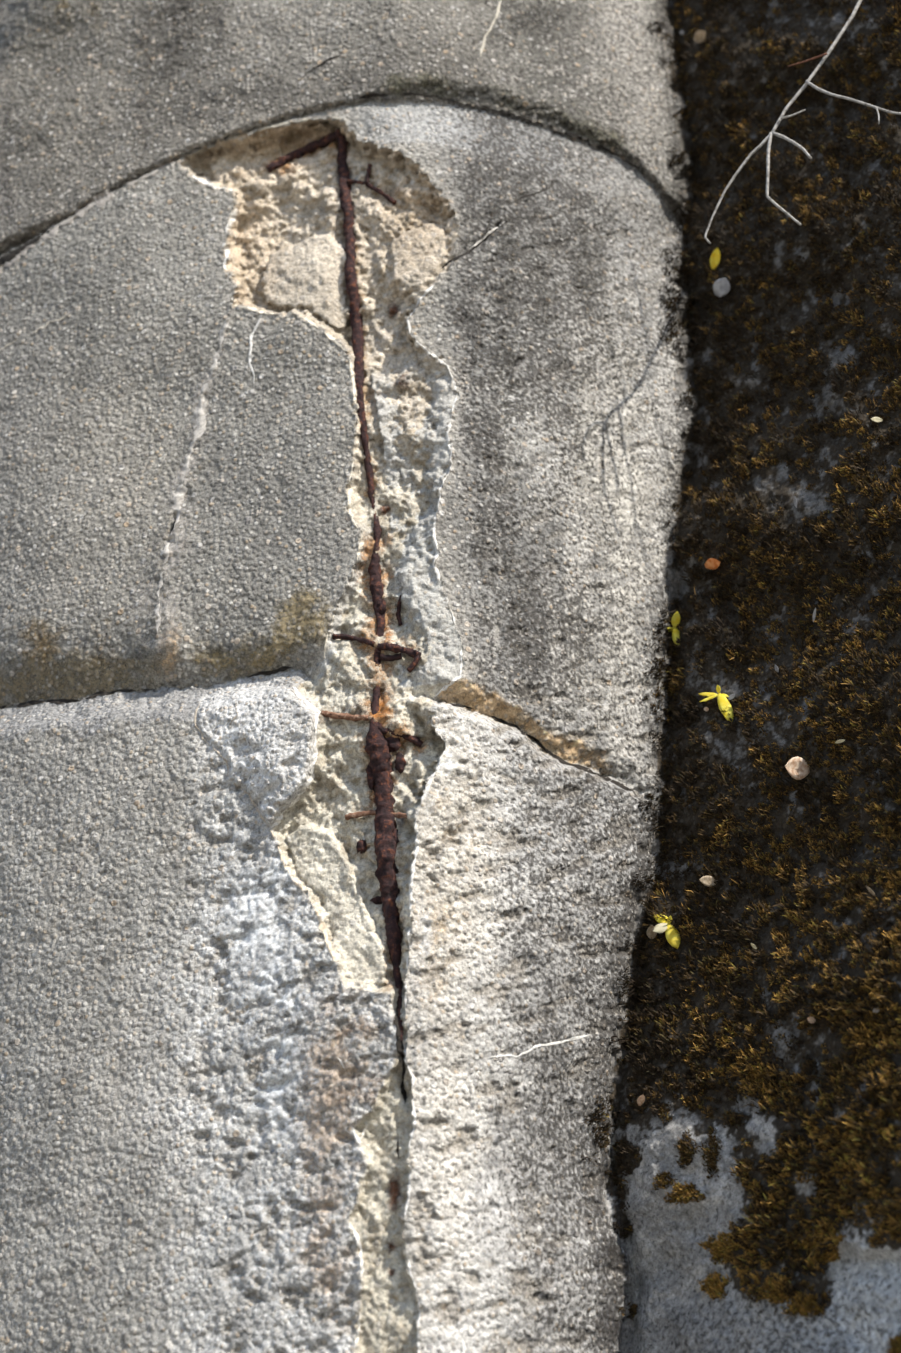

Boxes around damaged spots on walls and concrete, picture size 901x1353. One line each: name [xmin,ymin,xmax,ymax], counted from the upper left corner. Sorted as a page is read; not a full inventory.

crack [441,185,553,269]
damp [0,373,215,708]
crack [154,307,261,634]
spalling [0,116,465,1353]
damp [194,591,330,679]
corrosion [356,839,369,855]
corrosion [353,537,425,800]
corrosion [298,1020,376,1293]